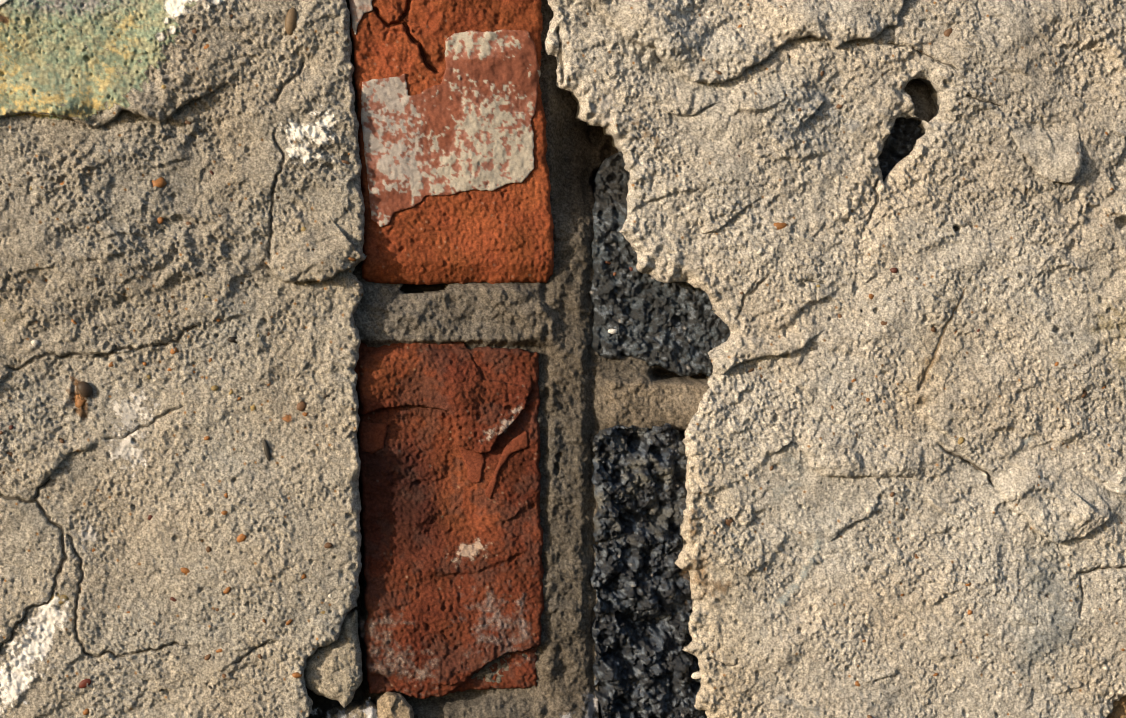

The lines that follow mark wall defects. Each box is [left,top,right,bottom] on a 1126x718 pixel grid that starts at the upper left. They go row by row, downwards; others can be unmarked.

peeling [349,0,373,35]
spalling [0,46,240,128]
peeling [361,29,541,227]
spalling [697,180,761,234]
crack [7,323,203,370]
crack [104,405,185,440]
spalling [354,342,532,499]
crack [939,445,994,487]
crack [0,479,188,658]
crack [1078,566,1126,614]
crack [234,640,270,663]